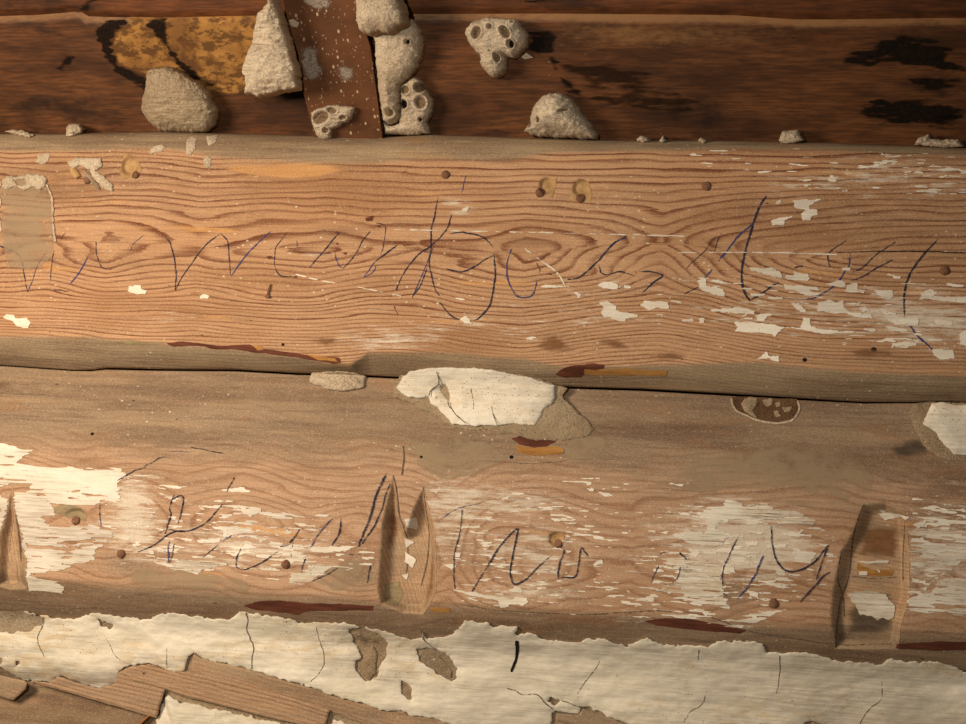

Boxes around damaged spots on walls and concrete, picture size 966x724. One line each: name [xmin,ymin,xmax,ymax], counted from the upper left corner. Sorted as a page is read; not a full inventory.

peeling [690,150,966,225]
peeling [599,294,682,321]
peeling [682,267,966,359]
peeling [0,443,375,594]
peeling [402,518,418,580]
peeling [444,478,629,608]
peeling [577,500,836,628]
peeling [847,498,966,620]
flaking render [0,611,43,634]
flaking render [350,628,388,681]
flaking render [401,681,412,700]
flaking render [417,648,457,681]